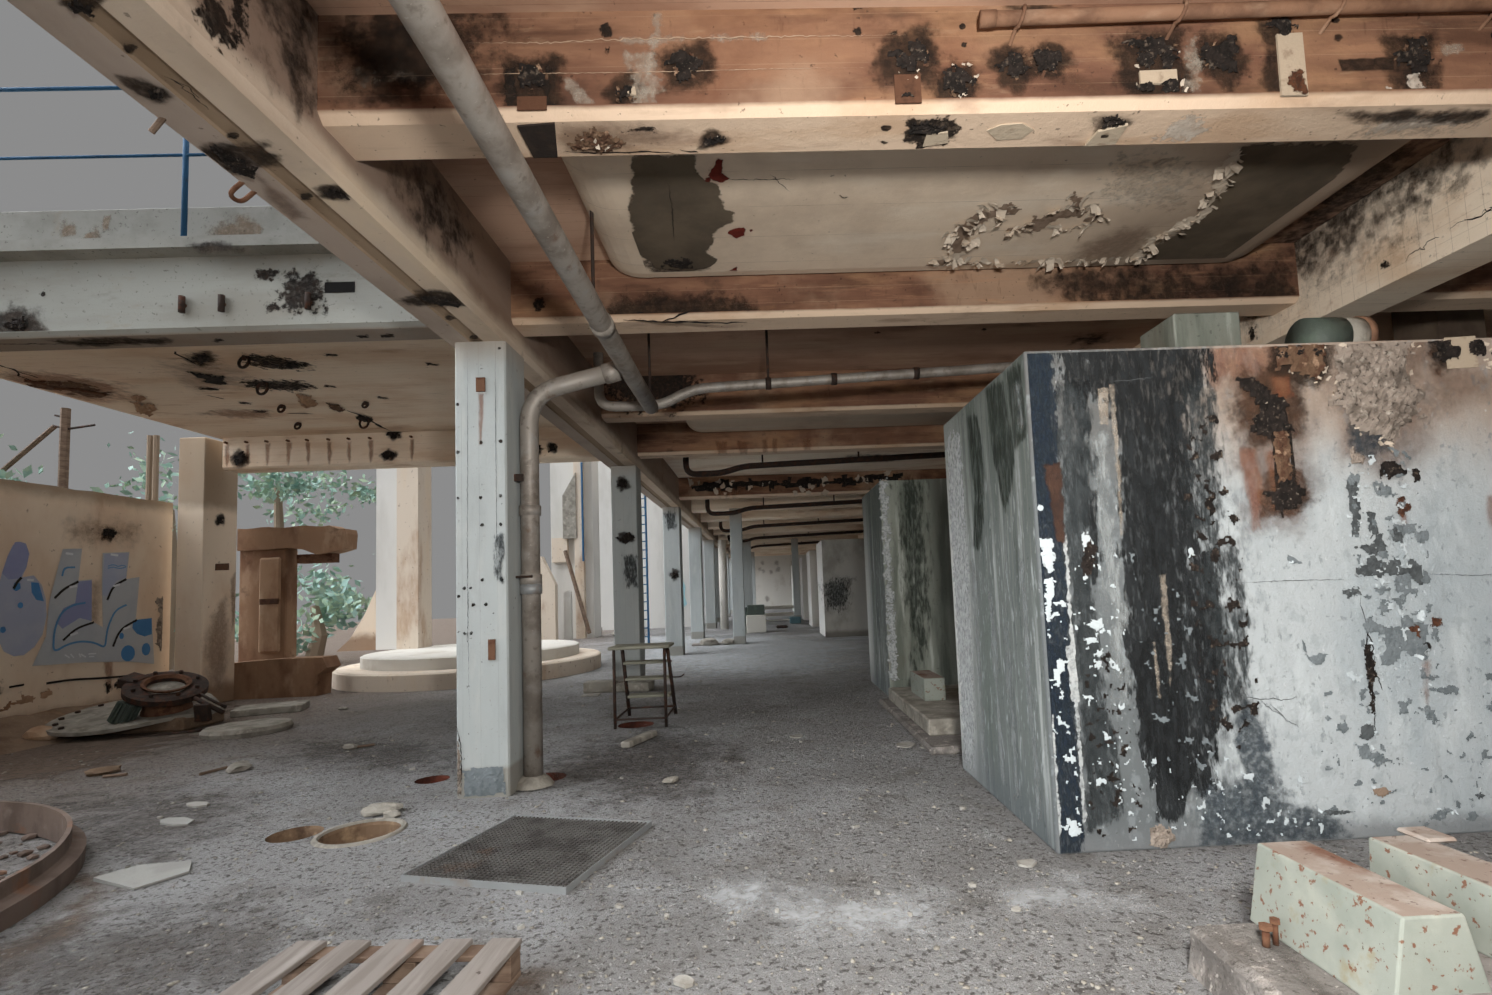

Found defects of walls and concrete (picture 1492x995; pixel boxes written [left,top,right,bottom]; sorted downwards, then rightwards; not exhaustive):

damp [192,0,249,55]
spalling [644,257,699,272]
peeling [926,148,1244,272]
crack [1406,207,1492,261]
damp [878,477,932,681]
damp [946,348,1343,853]
spalling [1039,336,1492,848]